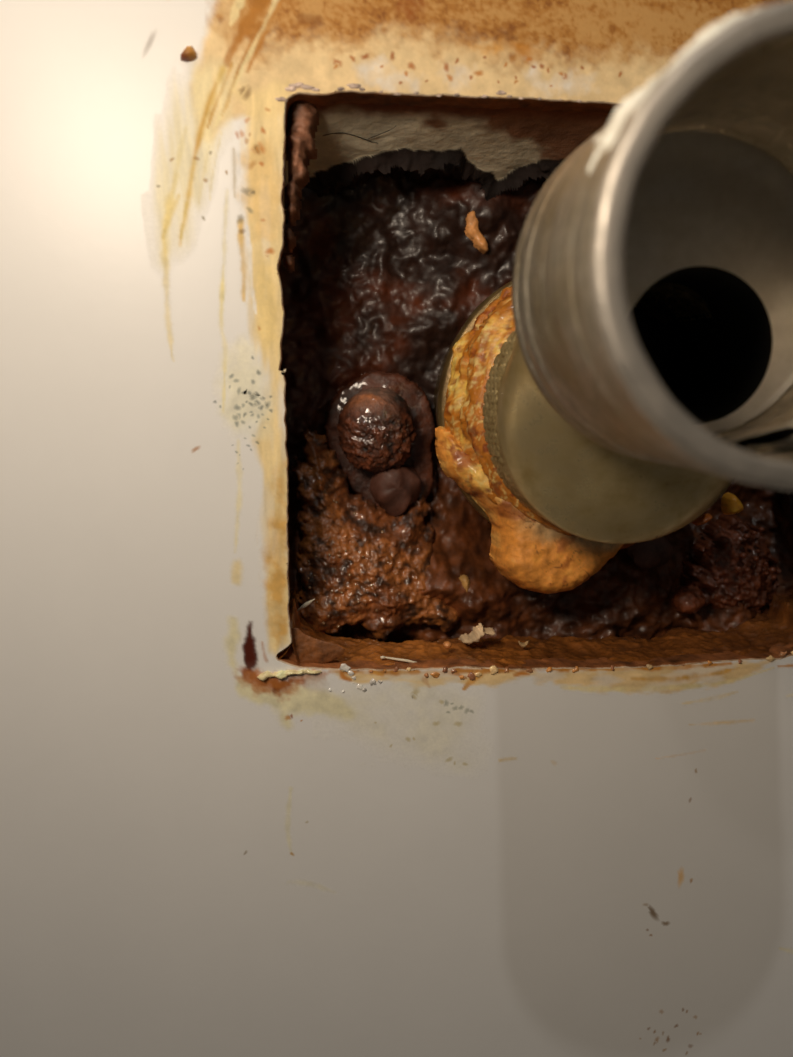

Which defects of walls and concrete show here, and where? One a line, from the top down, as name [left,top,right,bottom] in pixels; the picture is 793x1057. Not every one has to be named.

rust [141,0,793,733]
peeling [721,492,744,515]
peeling [257,669,321,681]
peeling [329,663,382,693]